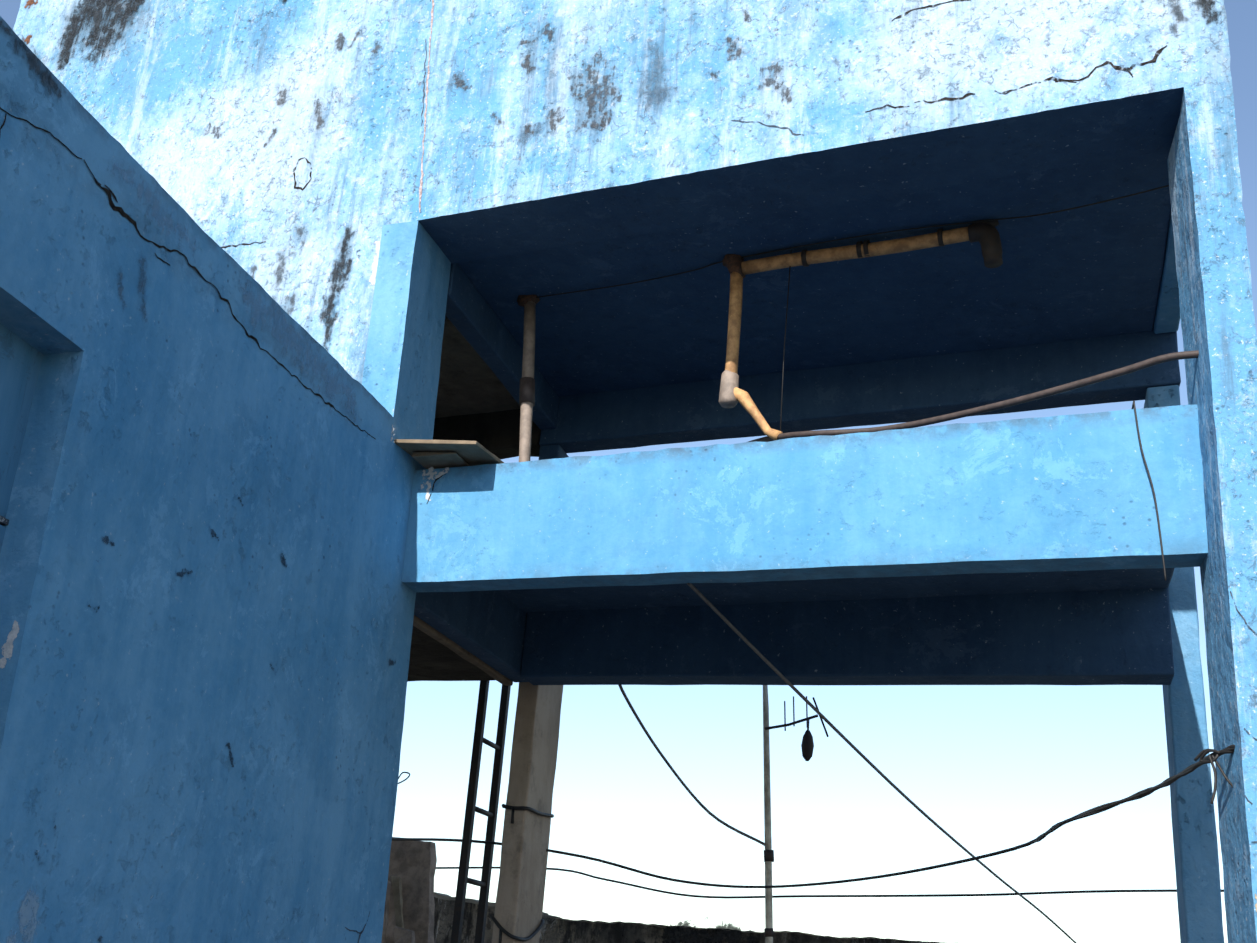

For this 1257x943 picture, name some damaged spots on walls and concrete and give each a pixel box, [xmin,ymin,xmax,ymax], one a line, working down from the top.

leakage [0,0,145,98]
crack [420,39,428,126]
leakage [521,50,621,144]
leakage [640,40,668,107]
crack [865,45,1167,112]
leakage [1163,0,1221,33]
crack [0,107,376,440]
leakage [320,227,355,349]
peeling [0,620,19,669]